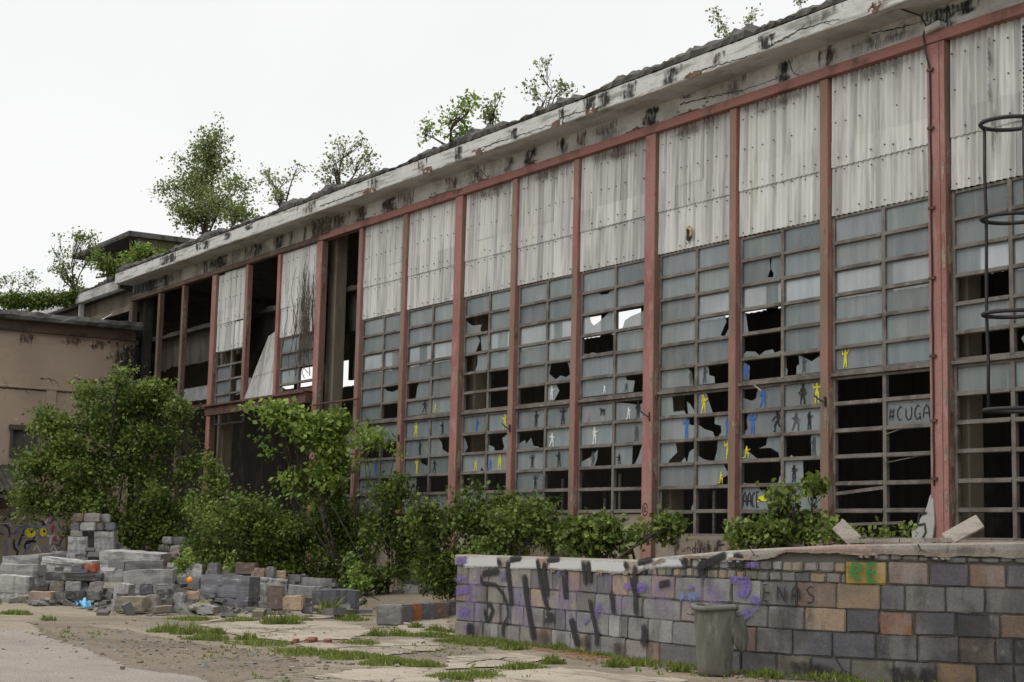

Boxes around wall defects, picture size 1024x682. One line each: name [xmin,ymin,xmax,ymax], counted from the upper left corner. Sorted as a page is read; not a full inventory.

leakage [921,0,979,26]
leakage [758,33,775,49]
crack [680,19,839,105]
leakage [776,61,790,82]
leakage [583,93,610,111]
leakage [643,106,659,126]
leakage [525,147,567,183]